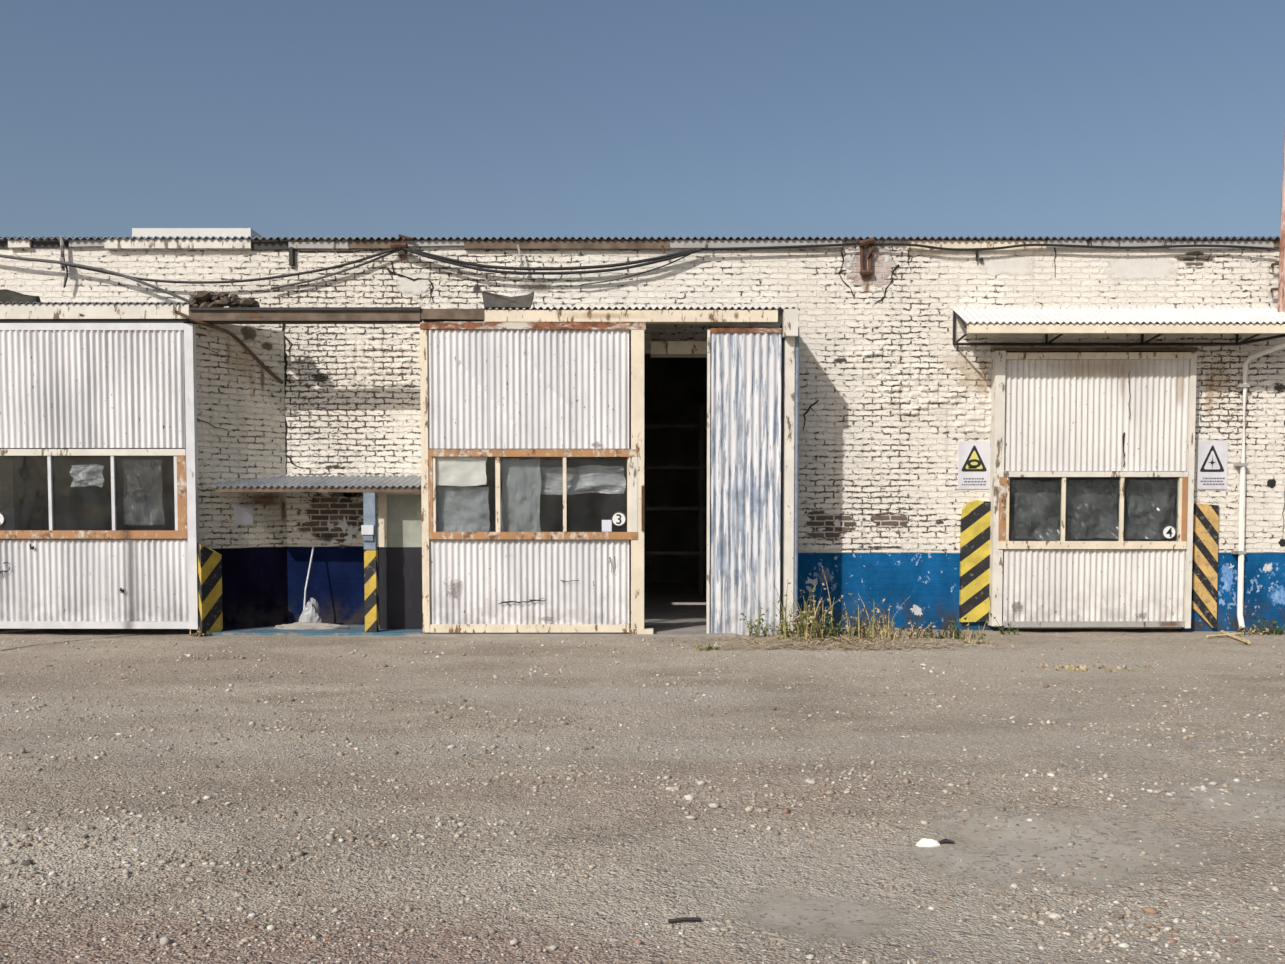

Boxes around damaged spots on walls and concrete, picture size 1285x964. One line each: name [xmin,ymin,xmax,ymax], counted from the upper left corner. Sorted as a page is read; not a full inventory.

spalling [297,486,364,549]
spalling [804,510,909,541]
peeling [1219,563,1235,605]
peeling [1270,586,1285,606]